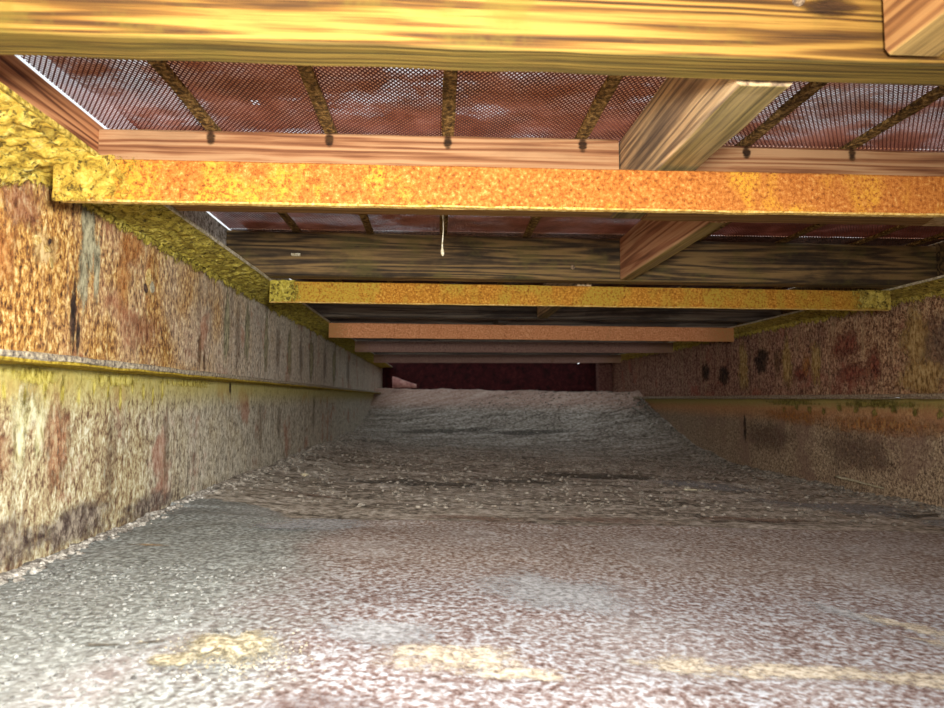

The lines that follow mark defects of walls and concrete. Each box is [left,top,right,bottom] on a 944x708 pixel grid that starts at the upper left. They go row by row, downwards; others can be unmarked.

corrosion [60,199,944,217]
water stain [70,206,101,355]
corrosion [270,301,889,311]
water stain [755,349,781,376]
corrosion [46,406,67,485]
water stain [120,491,173,522]
water stain [0,502,108,568]